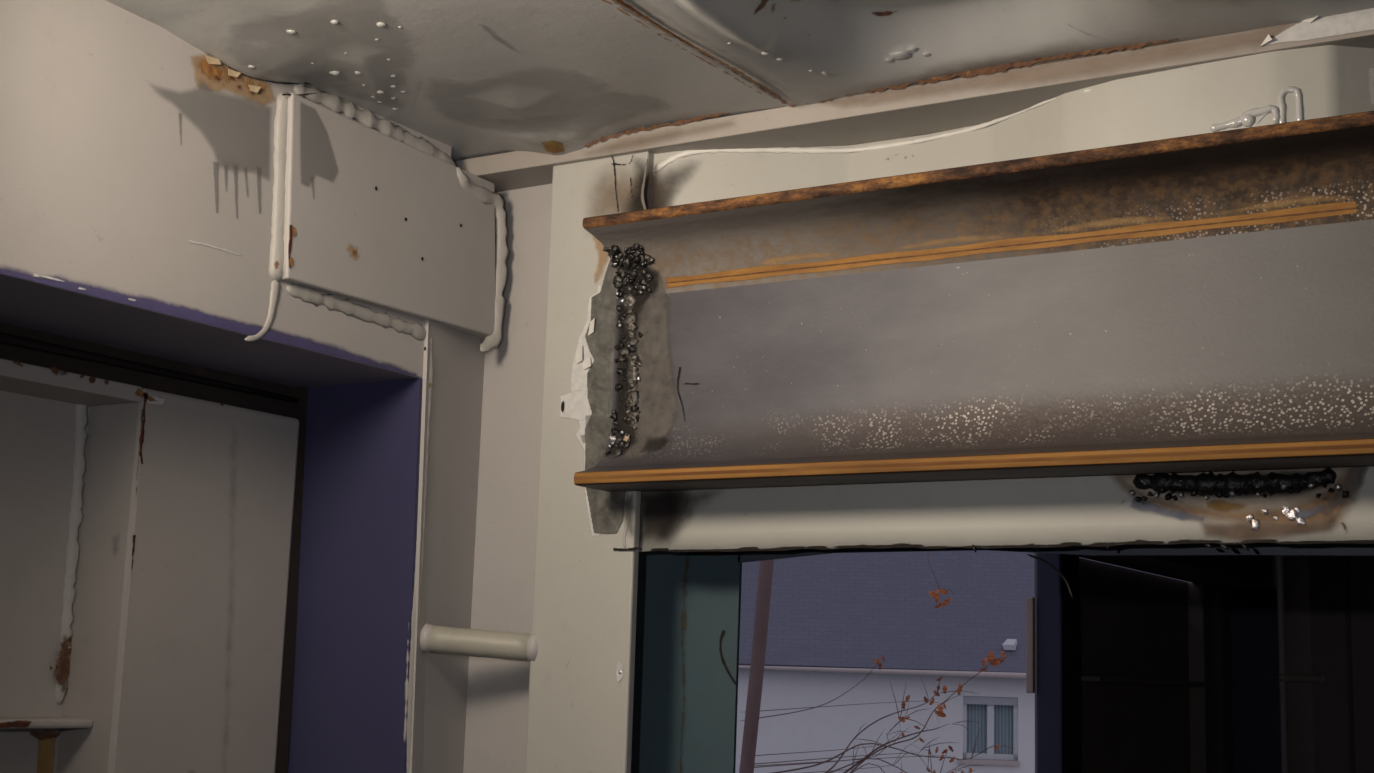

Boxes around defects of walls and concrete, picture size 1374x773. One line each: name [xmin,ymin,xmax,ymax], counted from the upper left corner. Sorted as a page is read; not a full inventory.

rust [602,0,1185,107]
rust [666,197,1357,288]
rust [135,388,165,471]
rust [50,636,72,691]